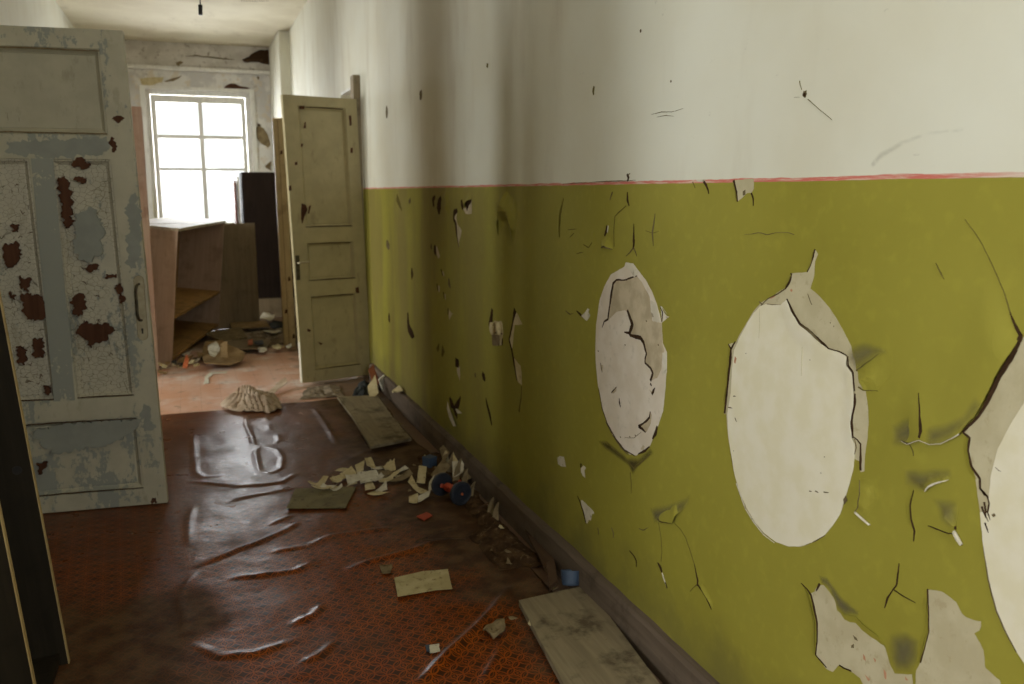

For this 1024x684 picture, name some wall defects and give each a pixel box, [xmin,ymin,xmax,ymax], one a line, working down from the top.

peeling [732,179,754,206]
peeling [489,308,522,413]
peeling [566,262,667,456]
peeling [722,248,893,547]
peeling [577,496,594,523]
crack [905,490,915,541]
peeling [962,313,1024,663]
crack [674,523,714,610]
crack [884,564,915,608]
peeling [800,583,1001,684]